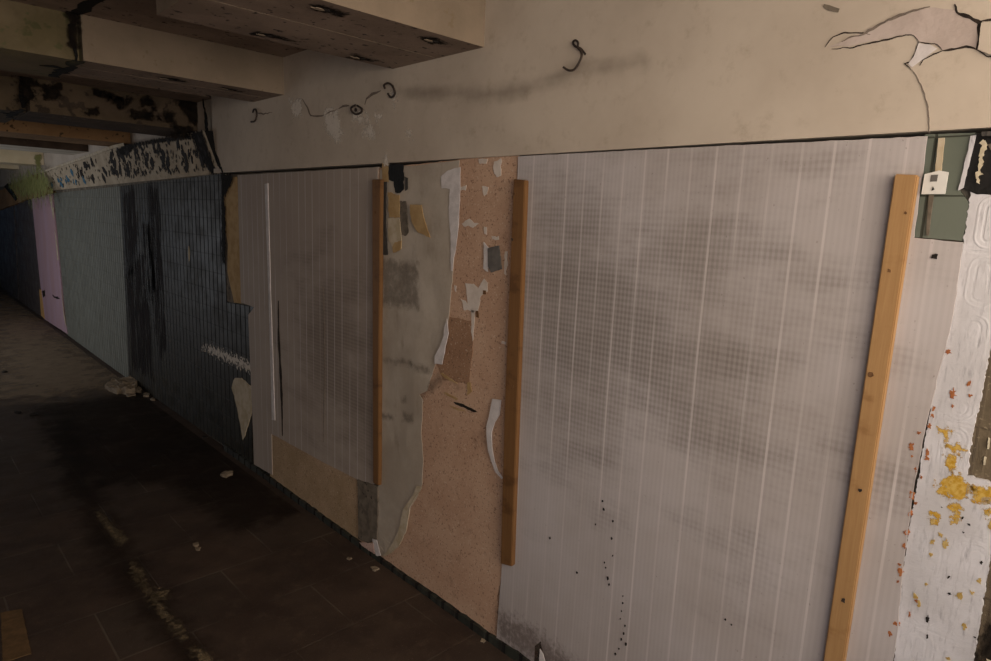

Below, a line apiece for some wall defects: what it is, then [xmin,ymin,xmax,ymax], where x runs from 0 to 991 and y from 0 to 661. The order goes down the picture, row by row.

crack [3,0,105,118]
crack [825,4,991,129]
water stain [84,88,198,140]
peeling [48,129,217,188]
water stain [123,180,166,382]
spalling [440,373,477,412]
peeling [486,399,503,479]